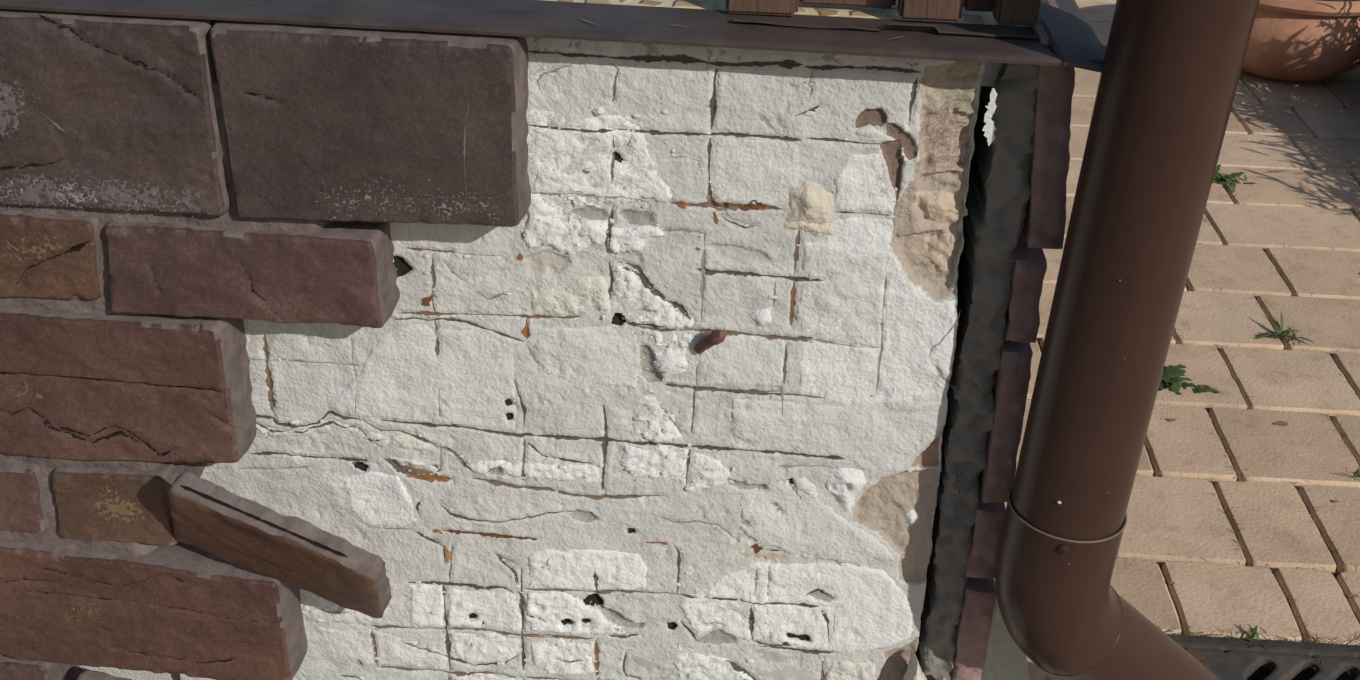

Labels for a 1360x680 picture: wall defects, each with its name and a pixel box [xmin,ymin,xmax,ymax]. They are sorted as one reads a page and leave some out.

leakage [0,63,40,141]
leakage [0,170,210,217]
rust [711,200,771,224]
crack [16,241,91,285]
spalling [393,255,413,277]
peeling [256,324,516,450]
crack [71,50,922,680]
peeling [523,61,997,680]
crack [0,407,172,457]
peeling [343,462,416,527]
crack [0,568,258,622]
peeling [306,549,647,680]